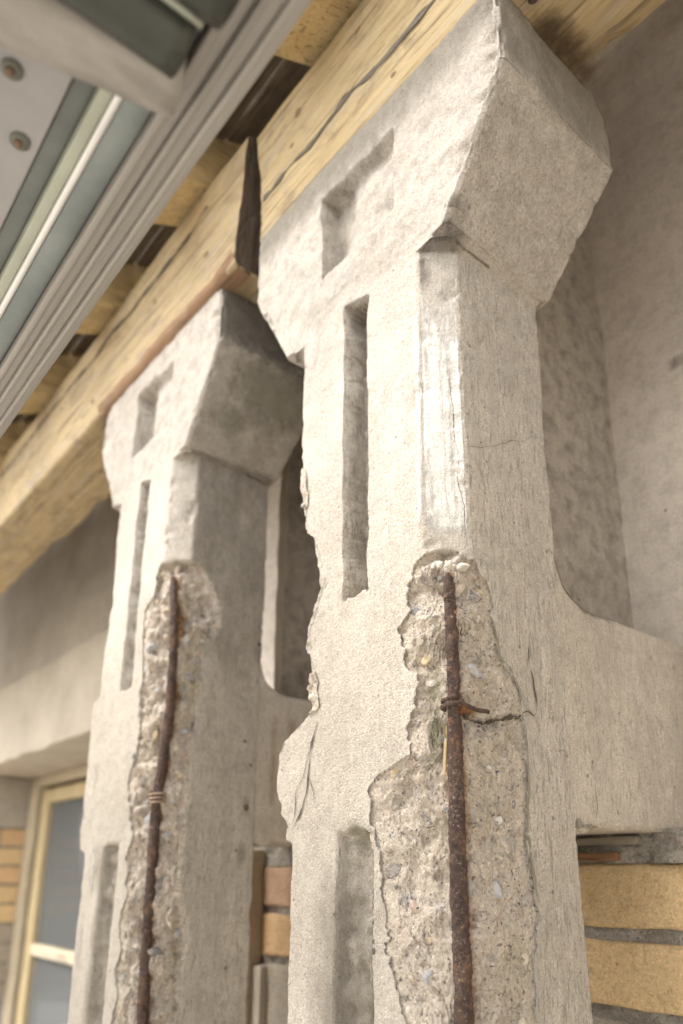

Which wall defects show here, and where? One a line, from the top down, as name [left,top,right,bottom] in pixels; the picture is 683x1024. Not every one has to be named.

spalling [113,563,222,1024]
spalling [281,431,321,715]
crack [291,722,318,829]
spalling [368,552,541,1024]
crack [445,370,539,542]
crack [460,632,537,725]